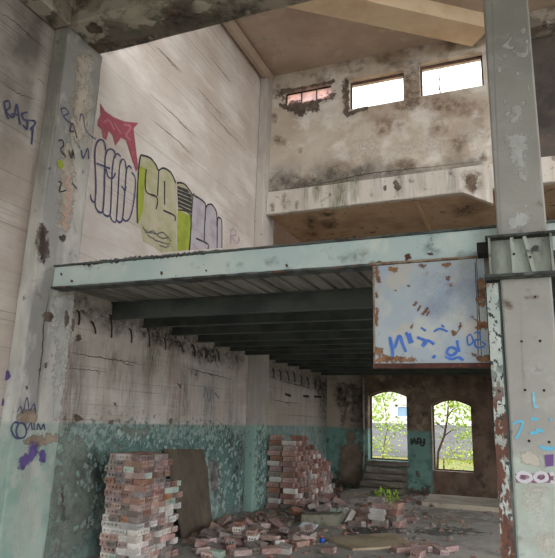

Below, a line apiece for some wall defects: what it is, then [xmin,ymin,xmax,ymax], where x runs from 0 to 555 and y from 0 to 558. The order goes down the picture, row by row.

peeling [118,0,173,30]
peeling [192,0,213,14]
peeling [56,22,109,232]
peeling [505,132,528,182]
crack [274,159,489,191]
rust [476,277,487,307]
rust [375,347,415,363]
peeling [23,291,245,558]